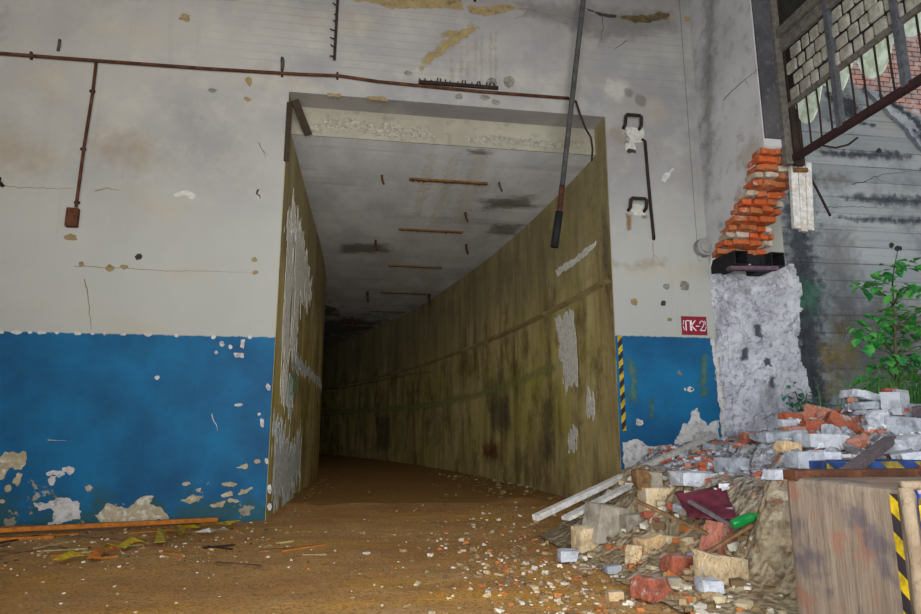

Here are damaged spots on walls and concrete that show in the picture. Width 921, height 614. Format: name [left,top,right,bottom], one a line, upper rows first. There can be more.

damp [891,102,921,139]
damp [822,150,911,159]
damp [847,194,921,206]
damp [839,216,921,224]
flaking render [670,147,812,445]
peeling [236,188,322,514]
peeling [622,439,658,468]
peeling [0,451,27,503]
peeling [46,466,75,486]
peeling [34,497,81,525]
peeling [95,496,169,522]
peeling [181,482,253,508]